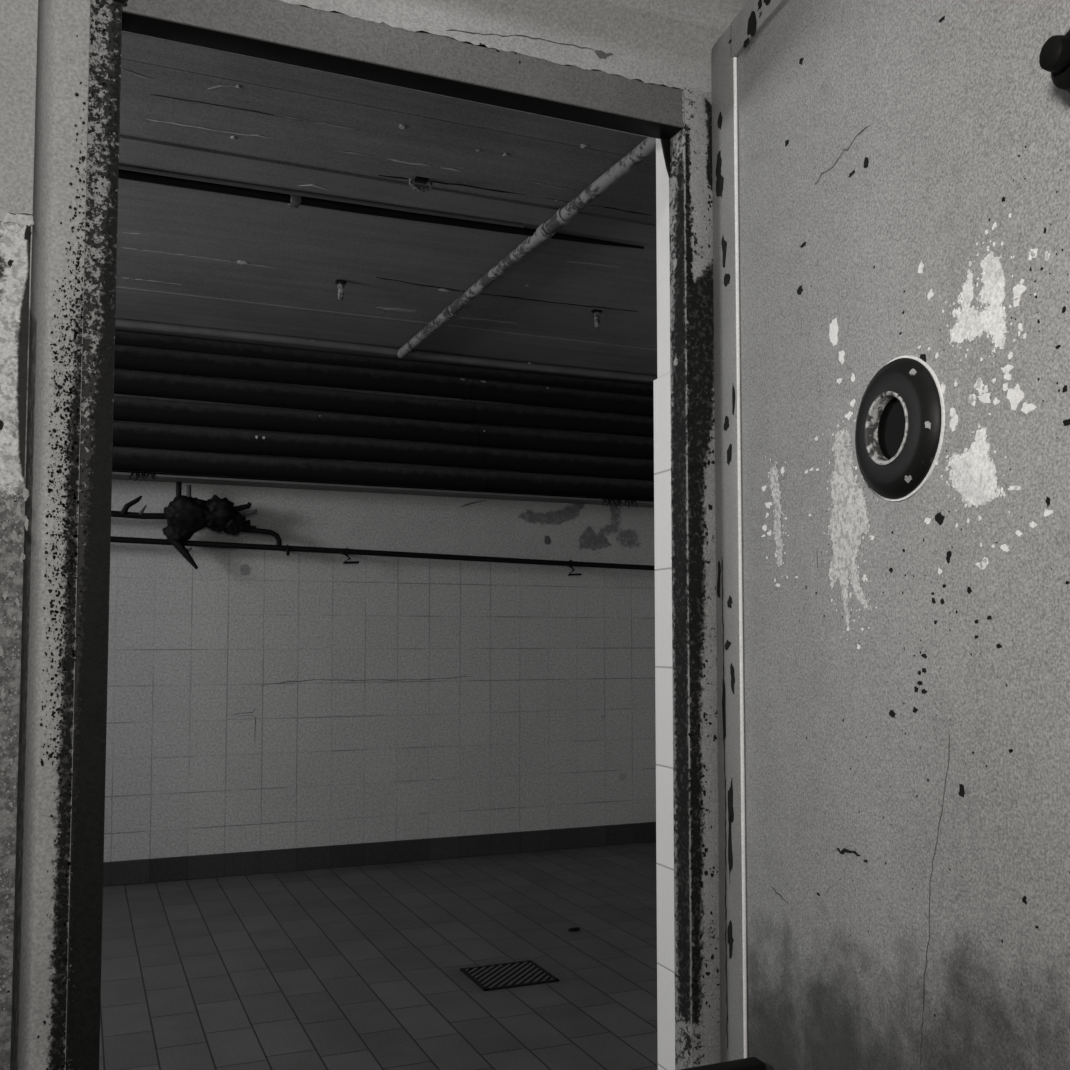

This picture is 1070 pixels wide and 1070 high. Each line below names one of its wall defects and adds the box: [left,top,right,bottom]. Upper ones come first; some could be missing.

leakage [0,256,11,297]
peeling [822,317,855,384]
peeling [917,218,1063,570]
corrosion [37,0,122,1070]
corrosion [670,98,720,1024]
peeling [761,456,817,594]
peeling [805,399,878,649]
spalling [889,546,958,614]
spalling [889,620,937,718]